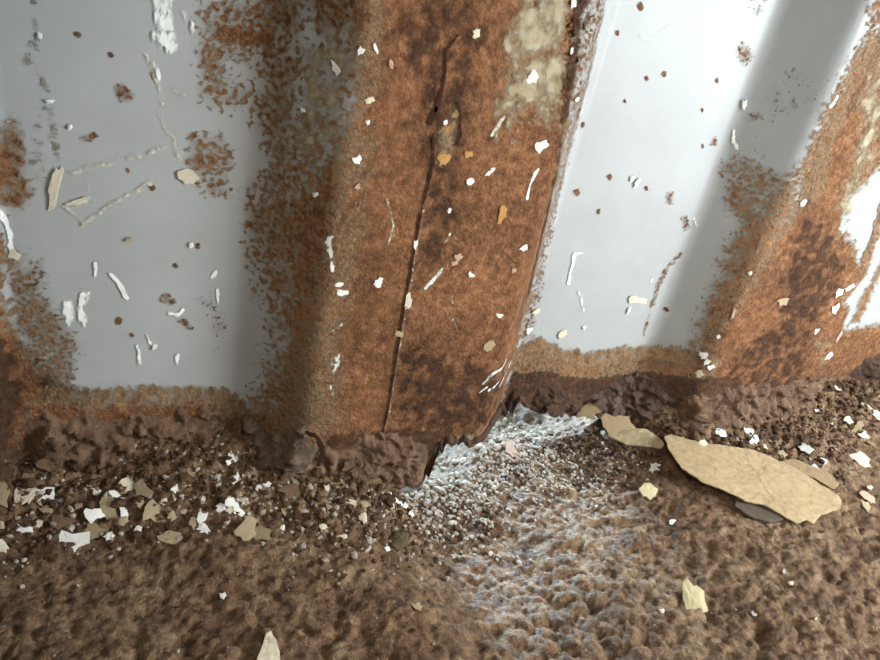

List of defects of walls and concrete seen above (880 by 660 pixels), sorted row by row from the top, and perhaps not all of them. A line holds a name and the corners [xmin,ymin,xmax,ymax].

crack [381,33,462,433]
rust [0,0,880,491]